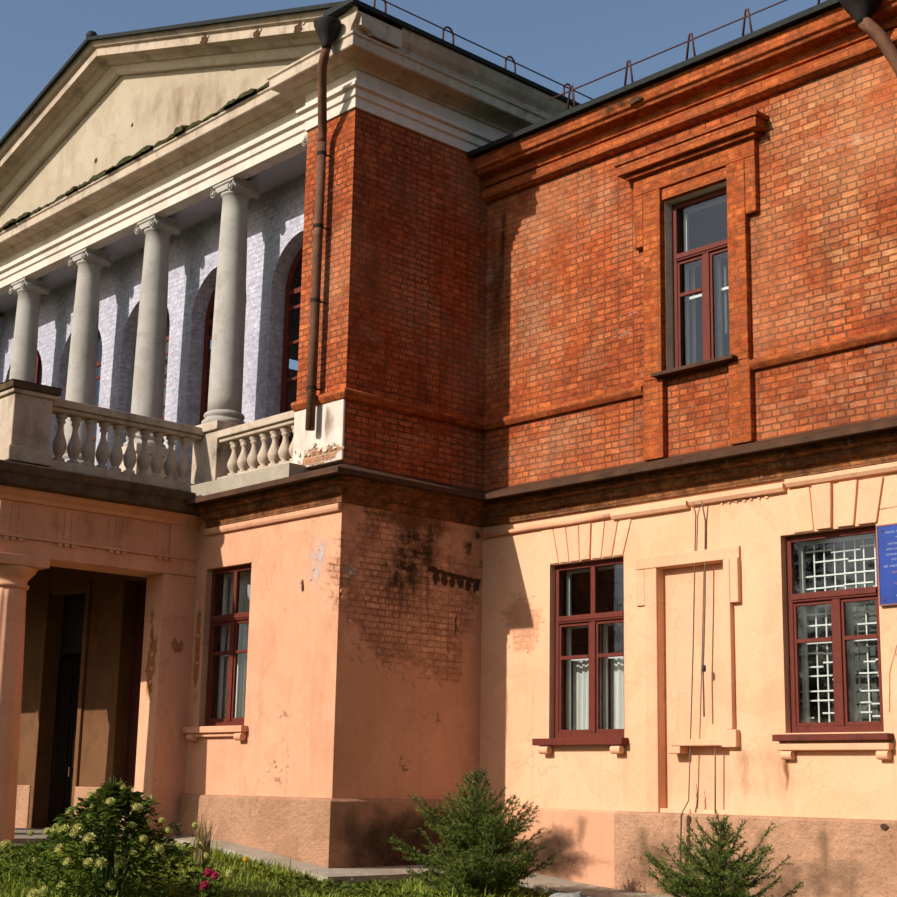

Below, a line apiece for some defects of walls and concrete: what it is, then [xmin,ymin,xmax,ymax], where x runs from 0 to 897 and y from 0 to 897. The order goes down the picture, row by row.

flaking render [294,442,344,466]
flaking render [299,507,483,688]
peeling [146,613,157,699]
crack [889,645,897,712]